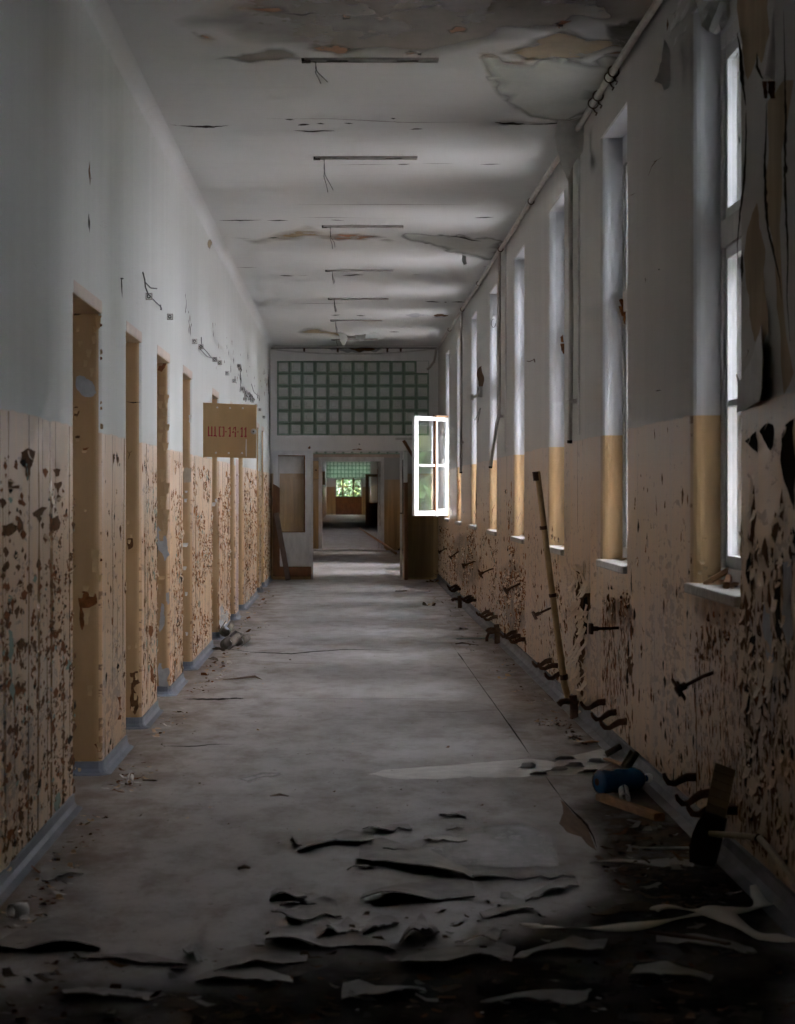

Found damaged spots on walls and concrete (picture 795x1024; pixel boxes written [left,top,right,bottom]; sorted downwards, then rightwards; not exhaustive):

flaking render [404,234,501,259]
flaking render [483,55,617,120]
peeling [0,387,271,871]
peeling [448,419,795,879]